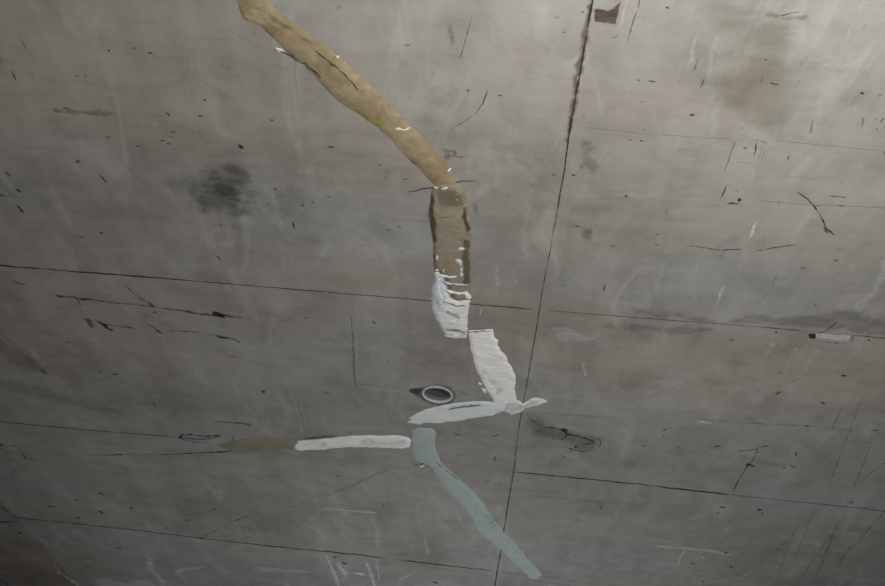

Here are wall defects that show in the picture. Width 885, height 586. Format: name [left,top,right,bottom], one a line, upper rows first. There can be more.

crack [237,0,472,300]
crack [799,193,846,235]
crack [57,288,241,342]
crack [161,422,298,455]
crack [550,427,601,459]